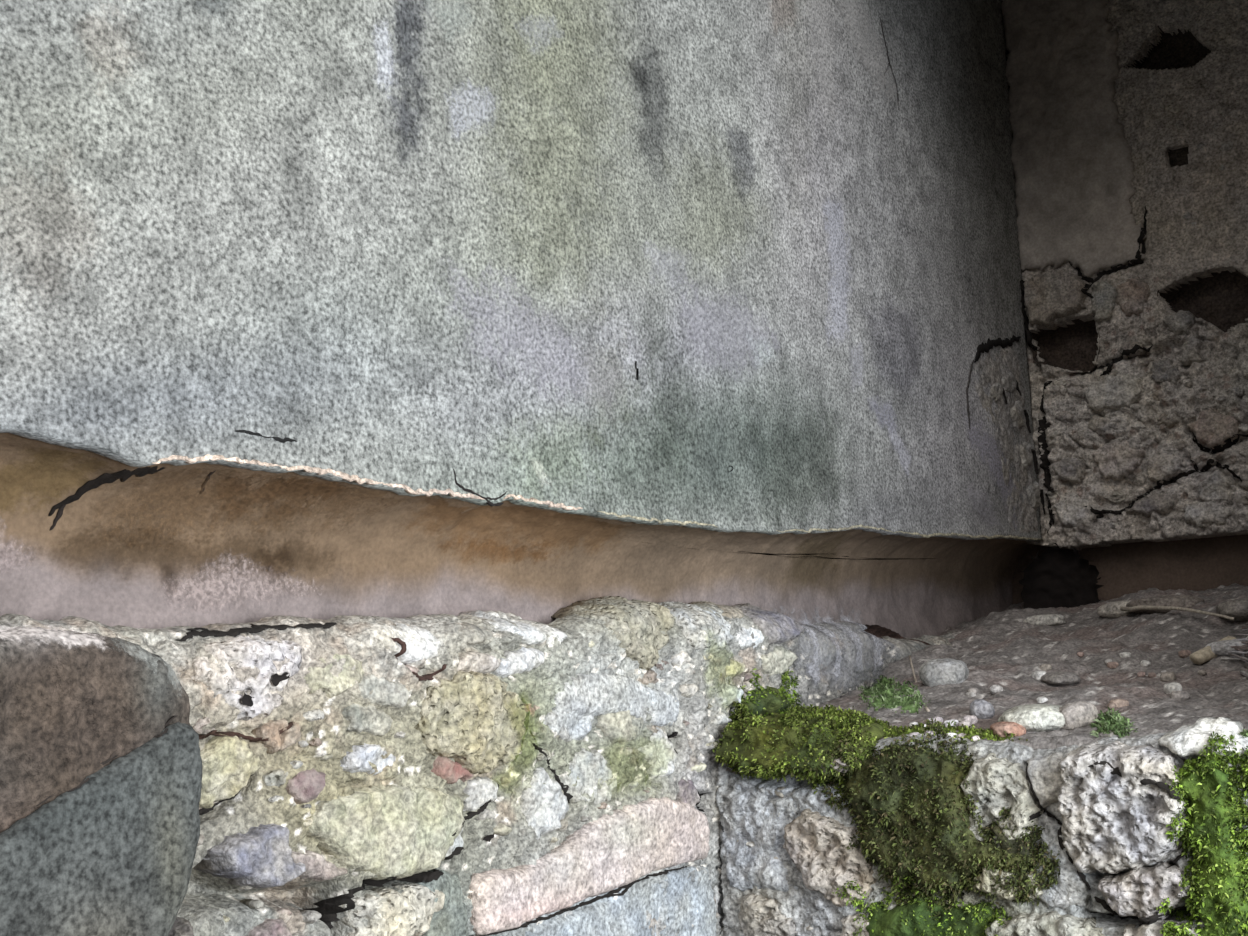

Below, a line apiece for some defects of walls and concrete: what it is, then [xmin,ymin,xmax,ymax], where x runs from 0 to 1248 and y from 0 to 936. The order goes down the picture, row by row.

water stain [375,28,391,83]
crack [1096,344,1152,376]
crack [235,430,297,443]
crack [48,465,165,531]
crack [199,470,216,494]
crack [1084,431,1248,518]